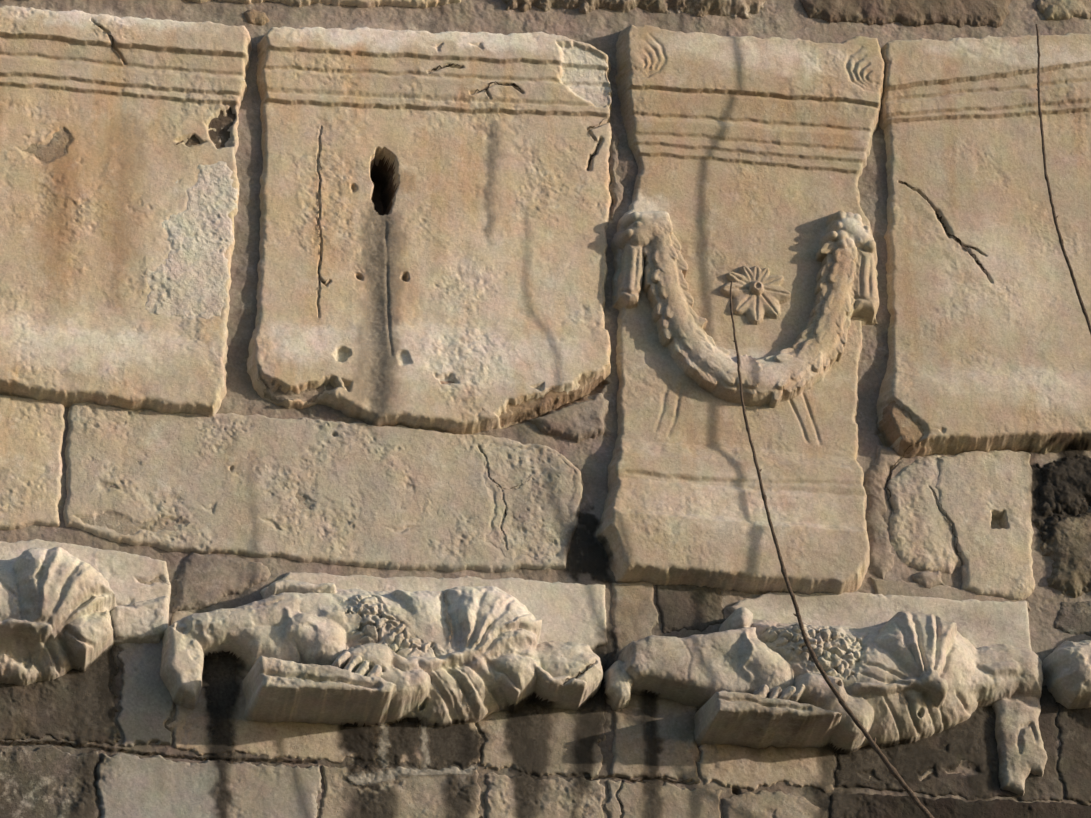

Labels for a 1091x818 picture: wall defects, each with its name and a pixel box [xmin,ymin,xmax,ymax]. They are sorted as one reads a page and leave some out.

crack [474,81,521,97]
crack [587,121,602,171]
spalling [145,107,239,320]
crack [317,151,327,315]
crack [901,181,988,278]
water stain [360,204,400,424]
crack [885,440,924,514]
water stain [202,650,244,818]
water stain [339,717,483,818]
water stain [507,692,555,818]
water stain [571,628,616,794]
water stain [641,690,662,818]